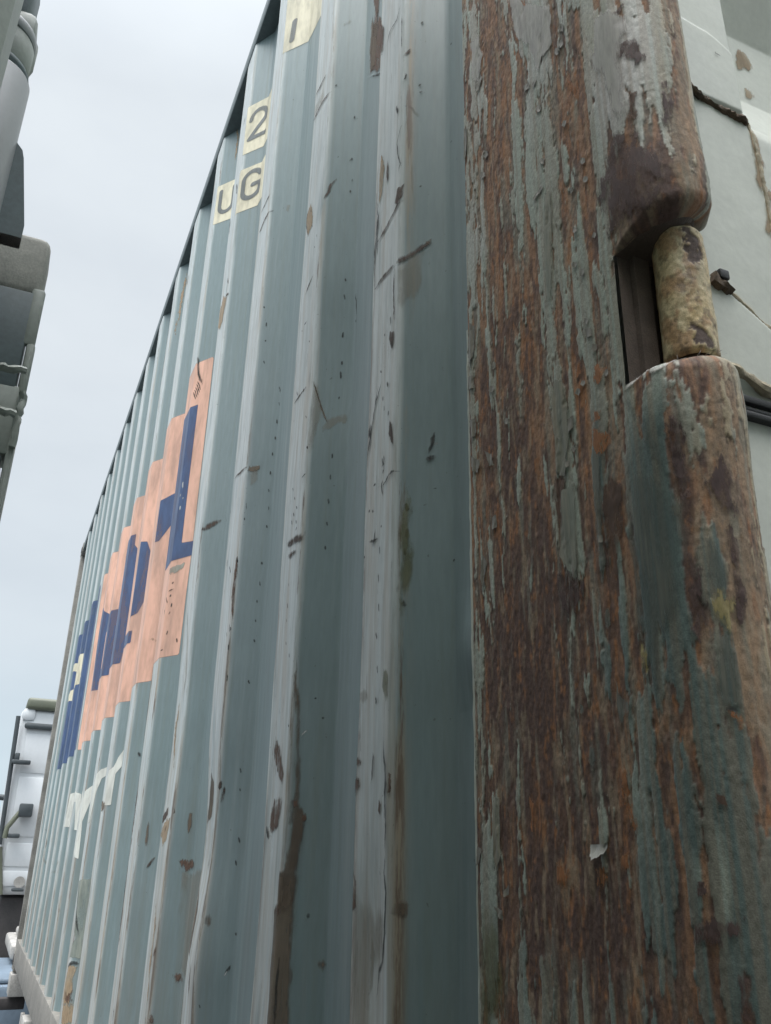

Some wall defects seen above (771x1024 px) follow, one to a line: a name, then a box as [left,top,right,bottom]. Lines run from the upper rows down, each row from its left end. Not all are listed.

peeling [470,37,483,81]
peeling [510,0,563,92]
rust [618,38,646,65]
rust [661,80,675,126]
rust [598,91,664,239]
rust [750,131,771,233]
rust [554,477,565,535]
rust [704,453,747,624]
rust [266,740,306,1024]
peeling [589,843,607,860]